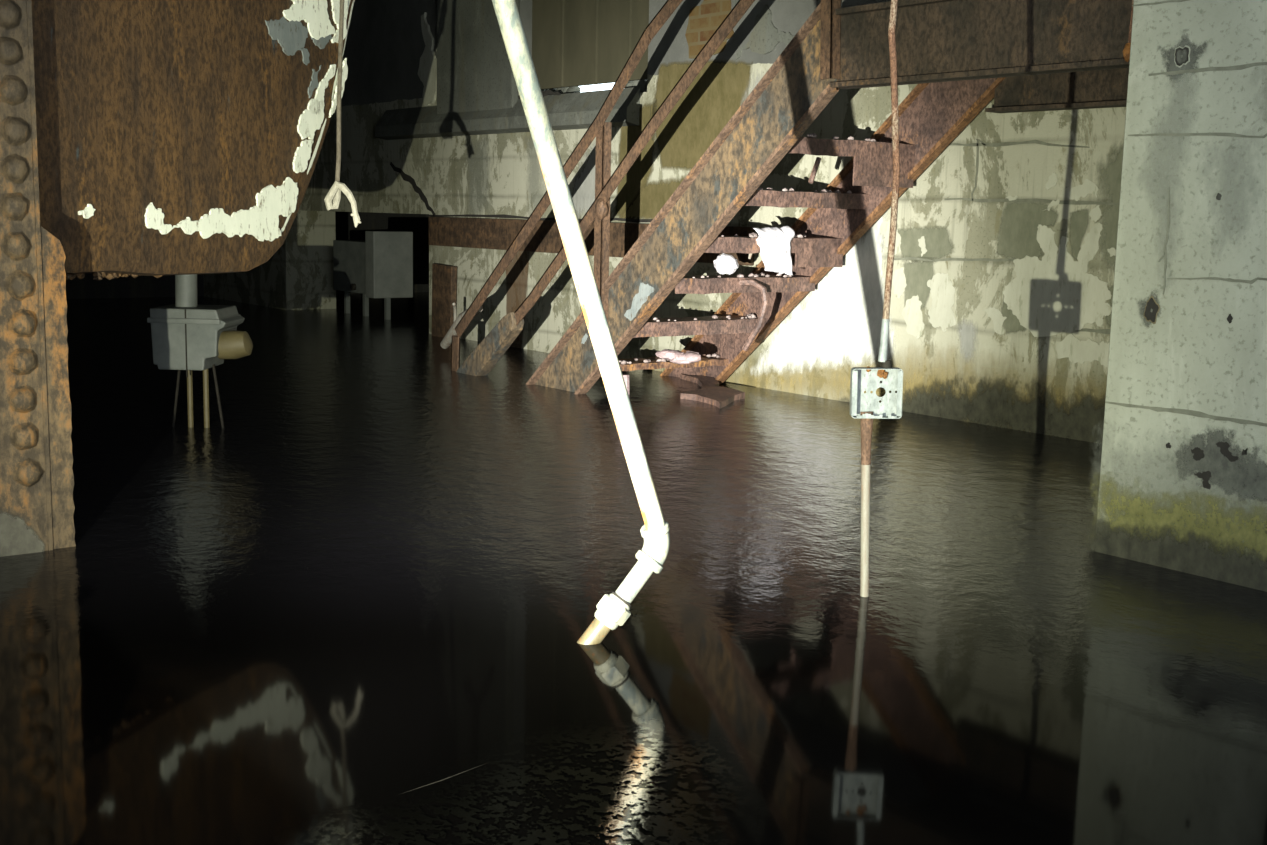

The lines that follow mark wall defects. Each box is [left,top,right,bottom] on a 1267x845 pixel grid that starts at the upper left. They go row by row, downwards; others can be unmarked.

peeling [144,0,355,241]
peeling [78,204,95,219]
corrosion [506,250,529,348]
water stain [727,216,1106,444]
peeling [880,220,957,339]
peeling [982,172,1116,367]
water stain [1176,430,1267,502]
corrosion [0,512,44,557]
water stain [1090,520,1267,592]